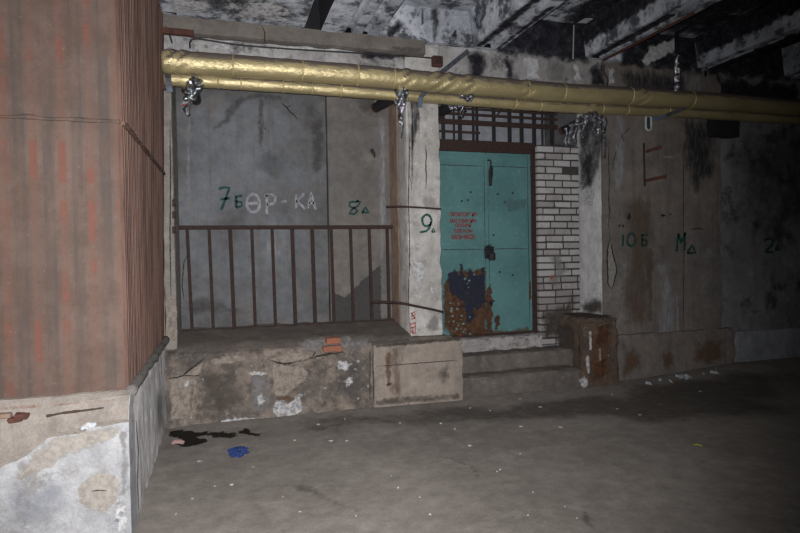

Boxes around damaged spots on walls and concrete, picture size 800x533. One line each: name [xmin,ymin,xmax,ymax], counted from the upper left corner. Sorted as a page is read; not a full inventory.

peeling [447,264,486,335]
corrosion [443,269,502,336]
crack [271,351,341,366]
flaking render [250,336,367,417]
corrosion [590,325,609,378]
flaking render [78,462,128,532]